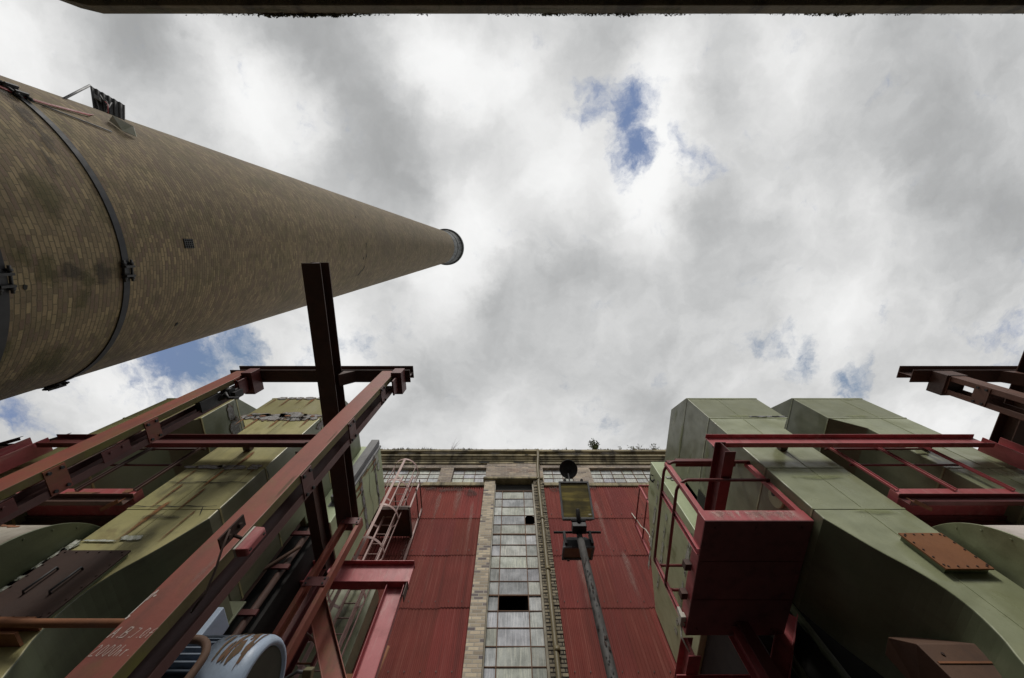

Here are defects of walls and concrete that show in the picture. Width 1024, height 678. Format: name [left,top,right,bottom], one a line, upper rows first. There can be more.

peeling [227,397,323,434]
rust [121,484,205,537]